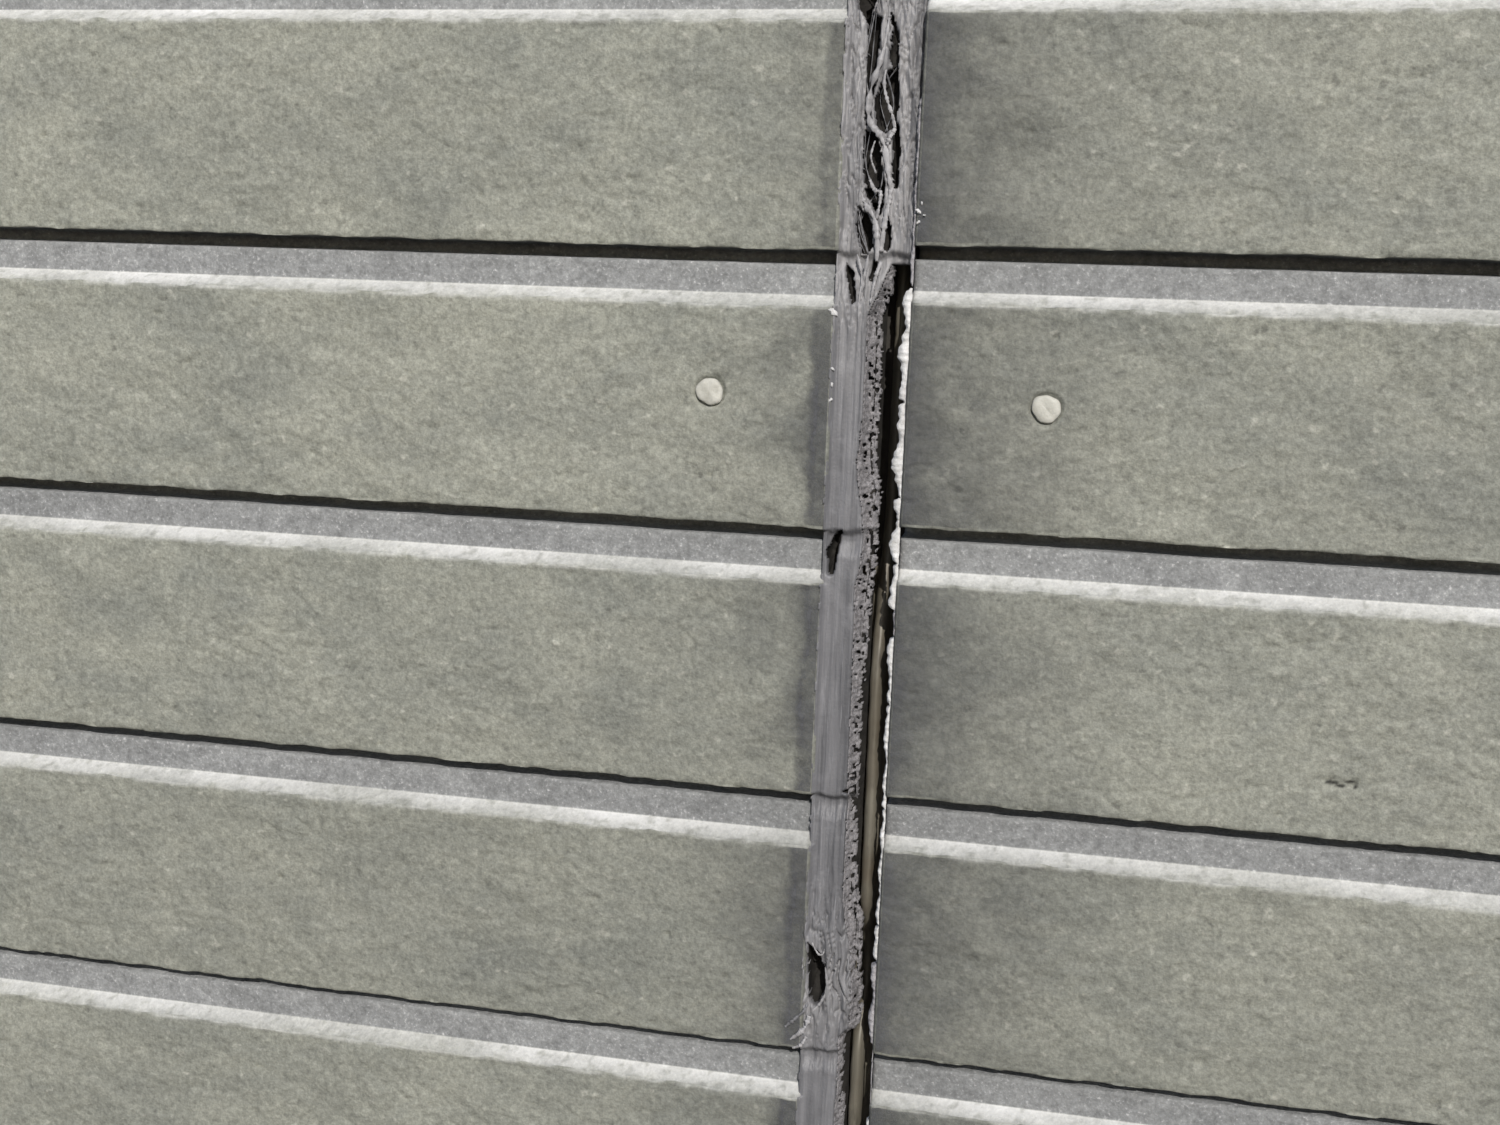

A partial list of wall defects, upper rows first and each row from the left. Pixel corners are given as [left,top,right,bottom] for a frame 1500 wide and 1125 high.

spalling [784,944,826,1049]
crack [834,265,897,1125]